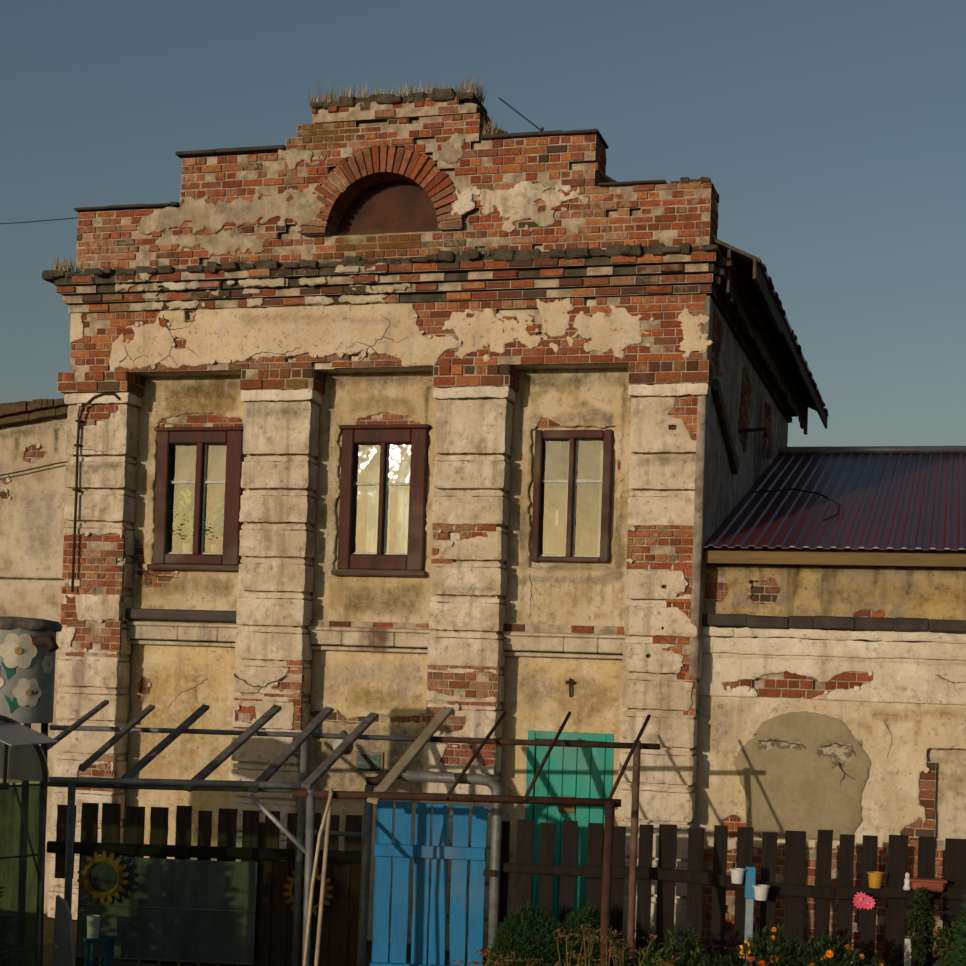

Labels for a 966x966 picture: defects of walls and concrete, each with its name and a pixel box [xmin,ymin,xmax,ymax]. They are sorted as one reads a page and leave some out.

crack [119,315,202,365]
flaking render [70,310,403,372]
crack [351,316,407,361]
flaking render [413,294,723,378]
flaking render [60,527,179,658]
flaking render [431,523,498,564]
flaking render [626,525,694,620]
crack [234,673,286,693]
flaking render [233,660,499,774]
flaking render [652,635,697,716]
flaking render [722,670,873,699]
flaking render [896,762,945,885]